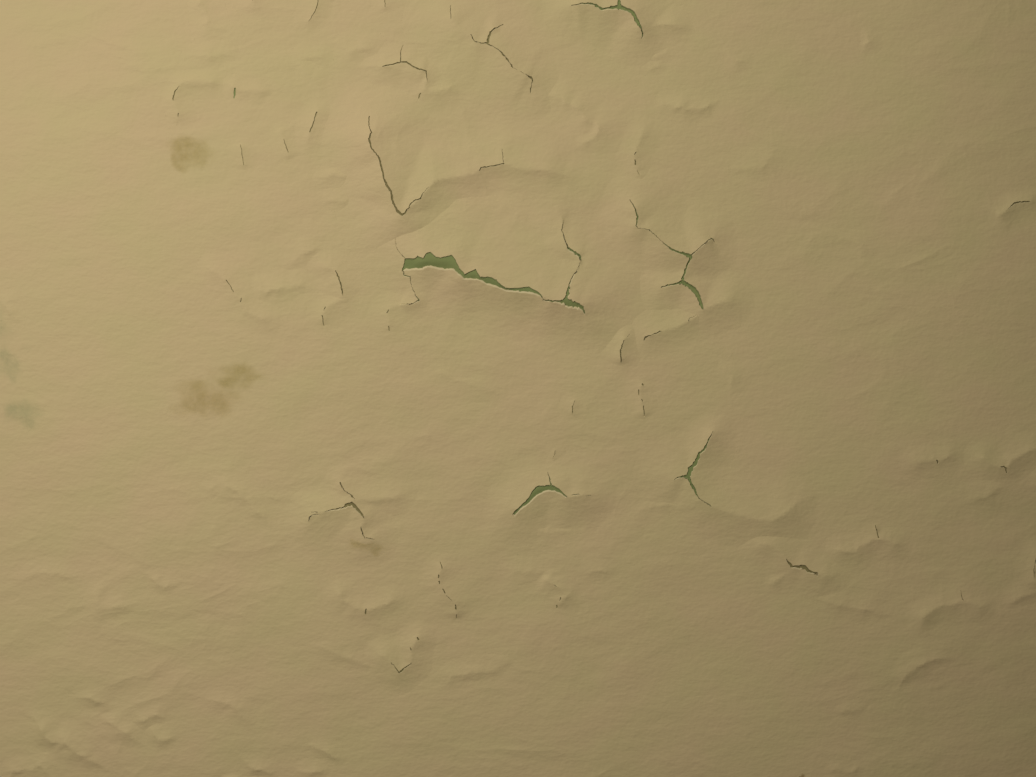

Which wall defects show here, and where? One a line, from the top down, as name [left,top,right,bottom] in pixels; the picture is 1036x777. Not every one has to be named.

peeling [360,194,645,353]
crack [601,308,701,373]
crack [482,451,618,546]